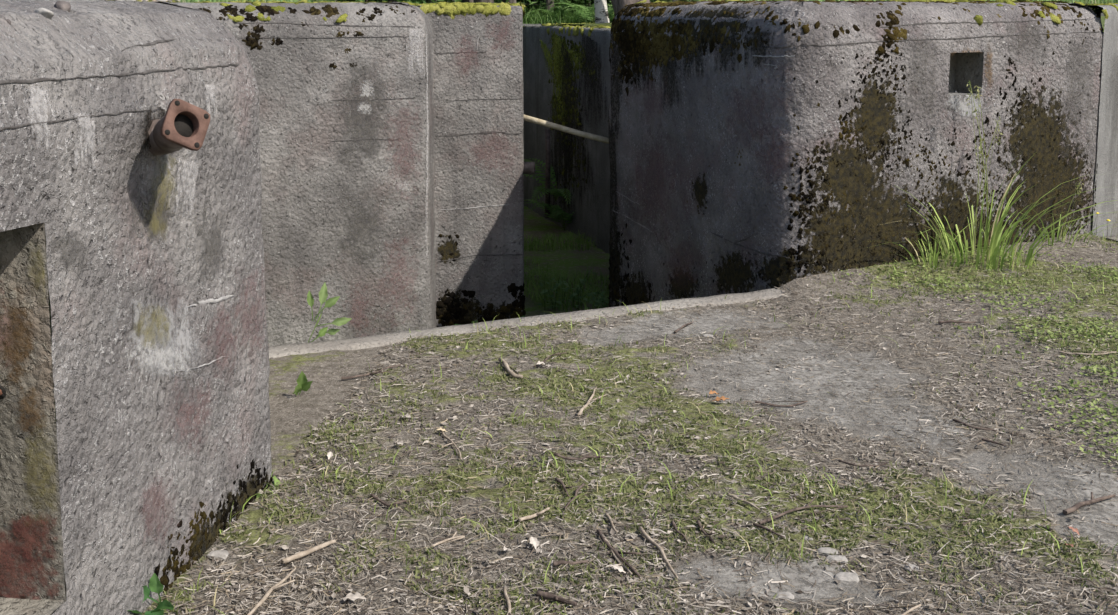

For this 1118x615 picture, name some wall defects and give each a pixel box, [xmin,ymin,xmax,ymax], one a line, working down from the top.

leakage [950,53,993,116]
corrosion [0,513,59,600]